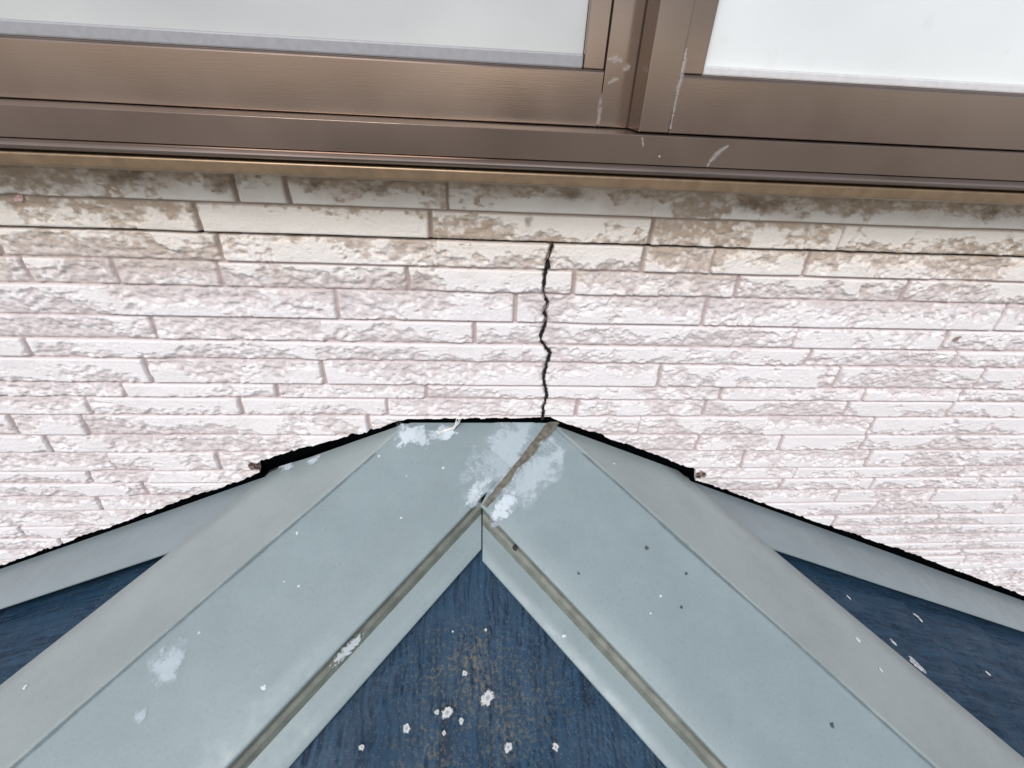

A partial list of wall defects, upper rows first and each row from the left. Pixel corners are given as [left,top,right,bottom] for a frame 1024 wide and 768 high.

crack [539,243,554,420]